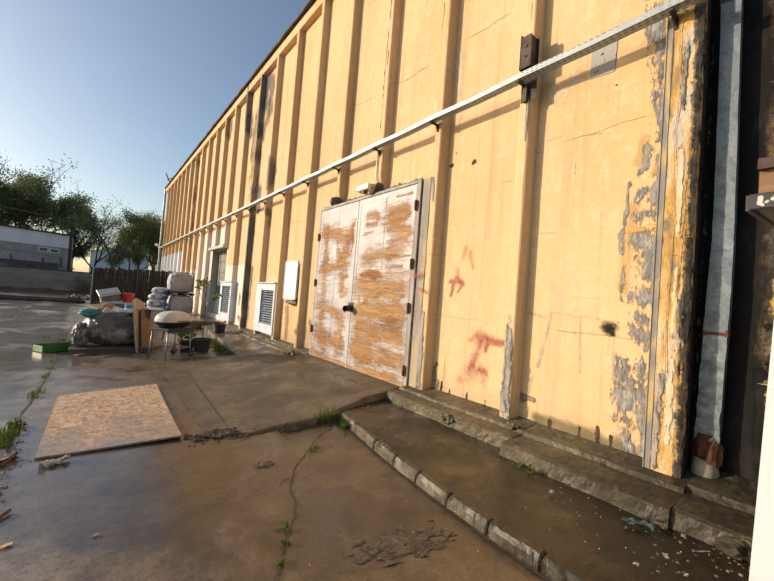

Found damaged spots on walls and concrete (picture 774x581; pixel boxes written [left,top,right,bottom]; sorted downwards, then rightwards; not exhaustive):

peeling [680,45,690,110]
damp [229,70,276,328]
rust [310,192,413,387]
peeling [608,0,675,469]
peeling [671,266,680,301]
peeling [675,149,685,238]
damp [718,0,774,482]
peeling [499,322,513,420]
crack [273,423,335,581]
spalling [345,519,457,567]